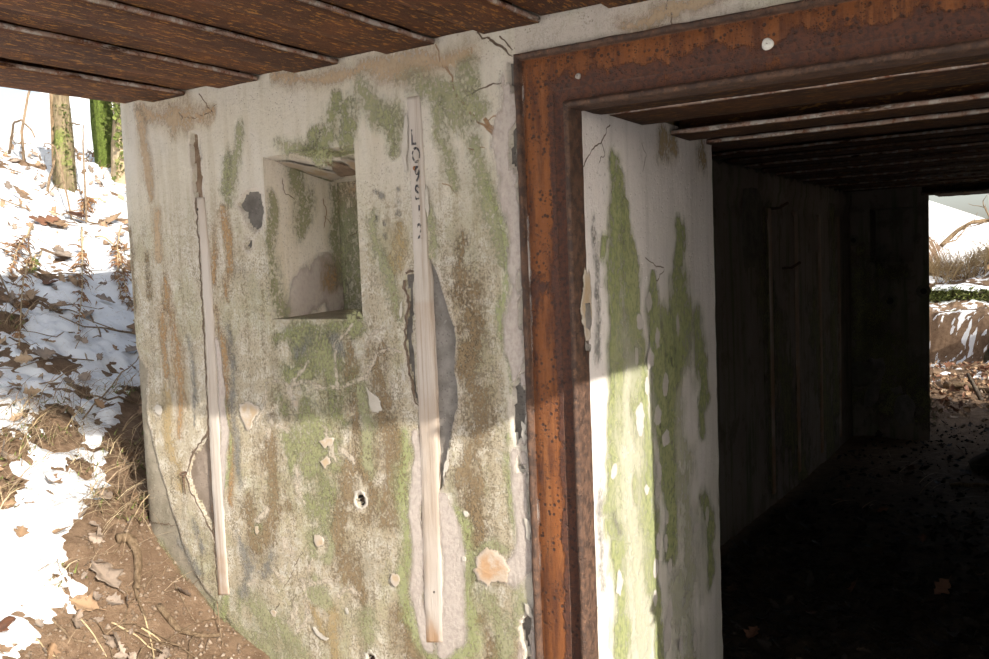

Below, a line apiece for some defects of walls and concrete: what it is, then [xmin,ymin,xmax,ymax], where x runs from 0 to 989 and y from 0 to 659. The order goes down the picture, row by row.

crack [477,32,513,57]
rust [129,105,215,493]
spalling [139,357,230,623]
rust [211,204,233,300]
spalling [242,192,267,230]
leakage [265,77,404,484]
spalling [399,274,419,403]
spalling [432,264,458,484]
leakage [409,430,538,659]
leakage [492,77,530,386]
spalling [514,379,527,443]
leakage [591,150,716,659]